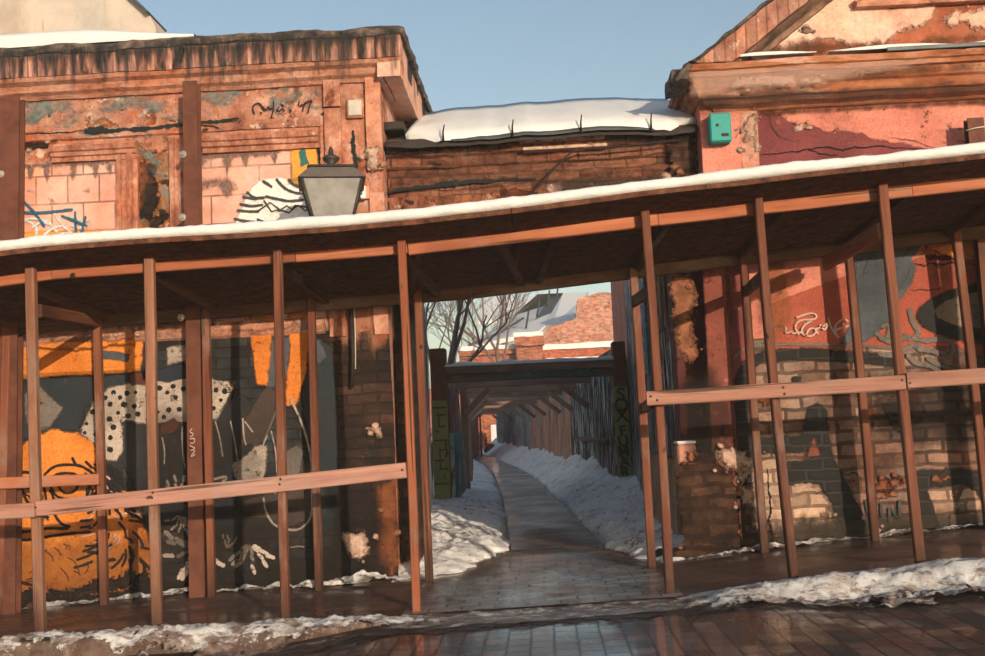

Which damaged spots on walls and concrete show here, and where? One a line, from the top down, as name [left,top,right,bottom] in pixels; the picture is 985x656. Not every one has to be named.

peeling [943,5,985,31]
spalling [83,116,119,129]
crack [761,119,965,156]
spalling [133,134,170,228]
peeling [342,507,401,565]